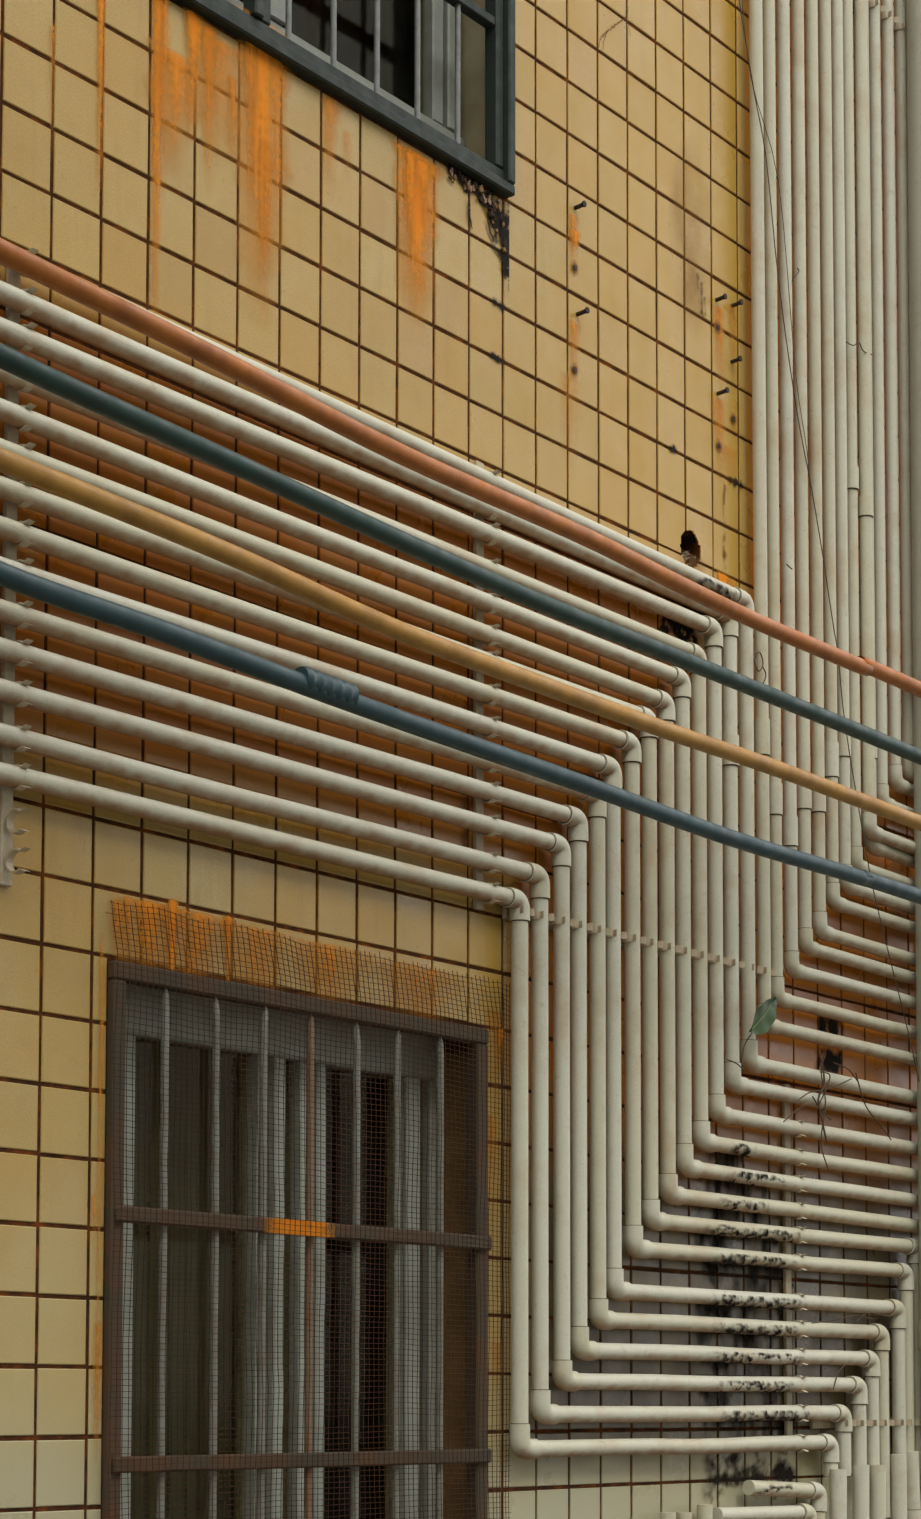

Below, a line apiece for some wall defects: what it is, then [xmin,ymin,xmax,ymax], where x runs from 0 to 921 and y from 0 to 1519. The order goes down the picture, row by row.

corrosion [152,0,286,242]
corrosion [395,143,439,288]